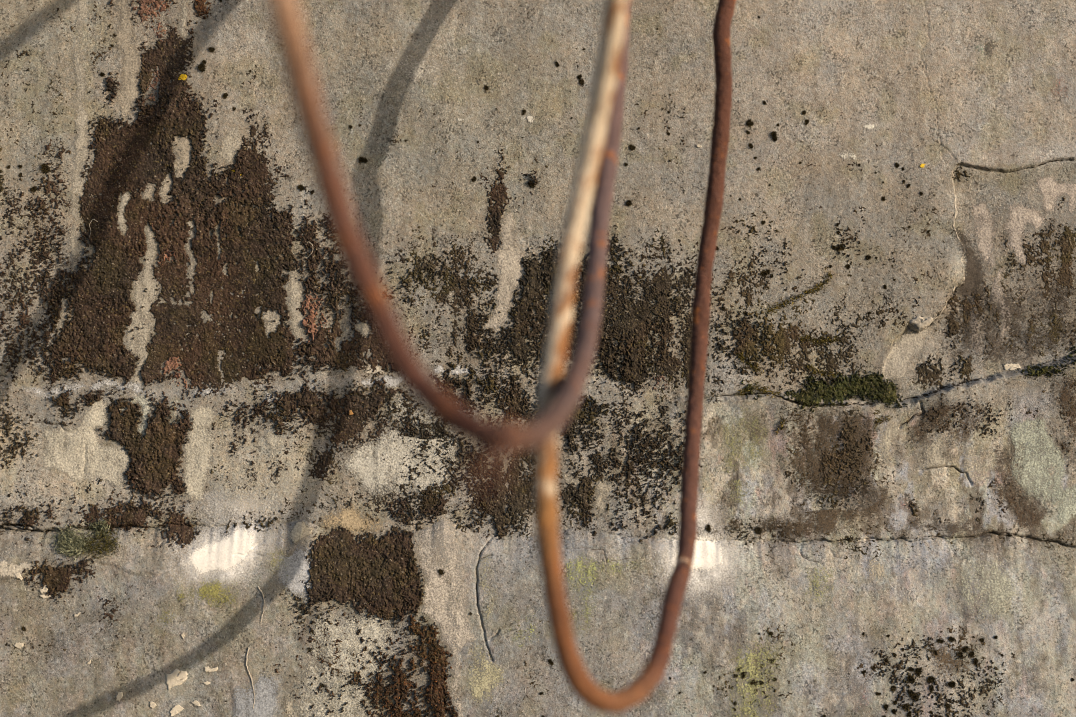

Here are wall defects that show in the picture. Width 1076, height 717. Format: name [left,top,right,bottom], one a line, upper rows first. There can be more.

damp [114,0,141,126]
damp [68,0,90,271]
damp [117,136,194,233]
damp [209,126,242,171]
damp [22,228,165,489]
damp [261,270,305,338]
damp [337,322,370,350]
damp [434,365,471,374]
damp [485,213,525,338]
damp [713,176,1076,543]
damp [340,376,459,499]
damp [413,514,499,717]